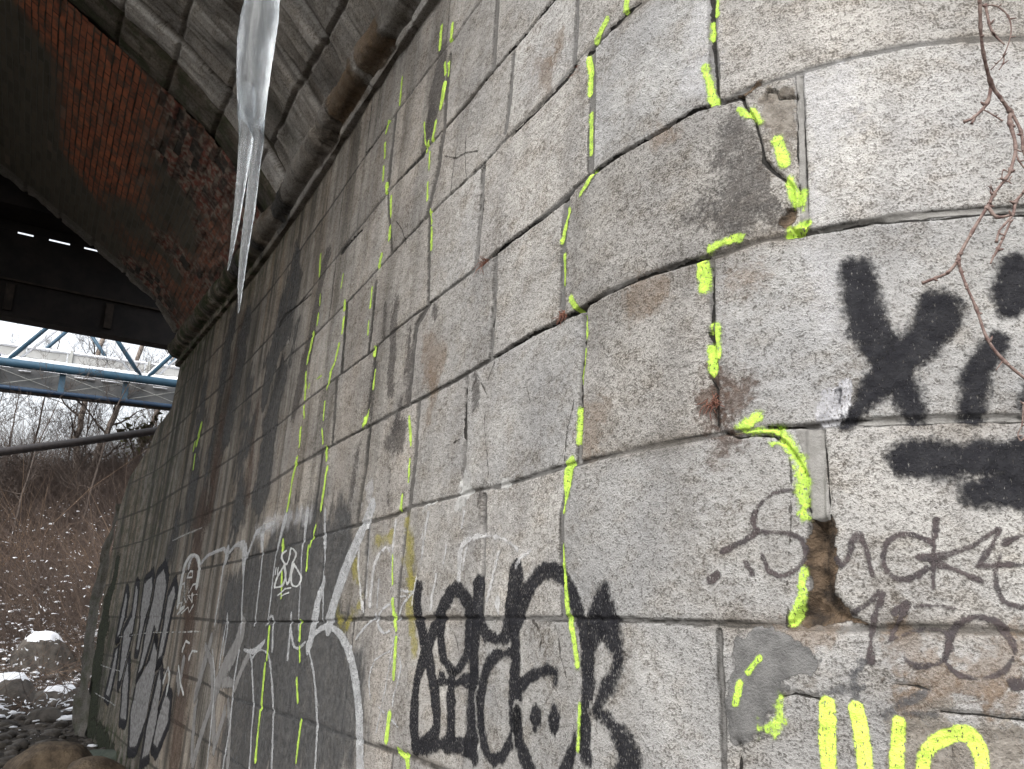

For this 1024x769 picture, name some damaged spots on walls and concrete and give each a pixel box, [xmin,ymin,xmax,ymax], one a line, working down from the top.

crack [723,92,1024,238]
leakage [165,239,331,566]
leakage [349,442,360,502]
crack [727,426,832,543]
crack [784,580,792,628]
spalling [789,515,869,628]